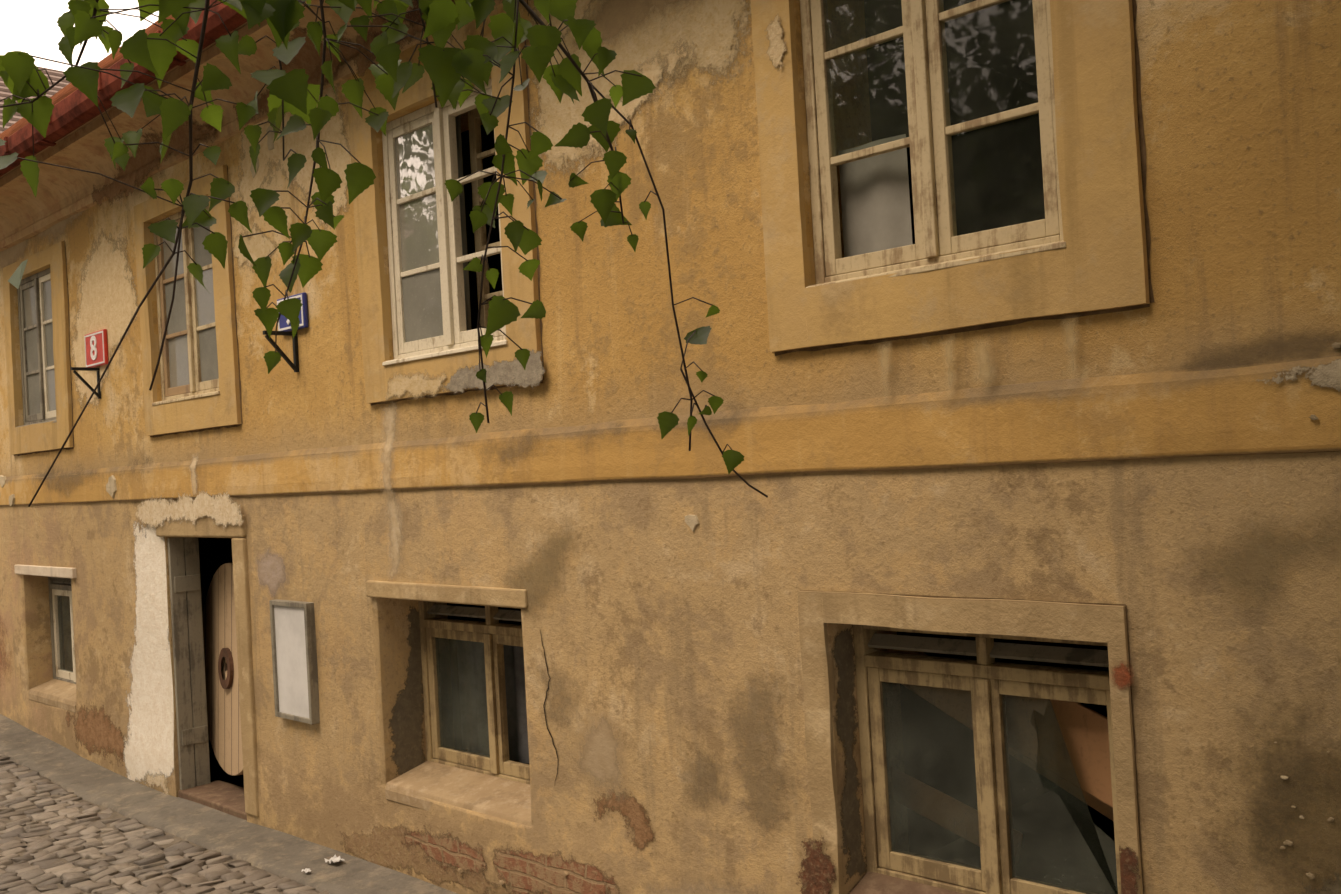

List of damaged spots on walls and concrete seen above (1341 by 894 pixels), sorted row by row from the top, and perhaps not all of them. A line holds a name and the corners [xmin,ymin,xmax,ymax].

spalling [91,117,216,206]
peeling [233,11,386,273]
peeling [528,0,787,181]
peeling [385,349,545,399]
spalling [1256,342,1341,392]
peeling [389,607,425,775]
flaking render [336,824,619,894]
crack [540,631,558,781]
spalling [593,785,656,850]
peeling [796,625,867,894]